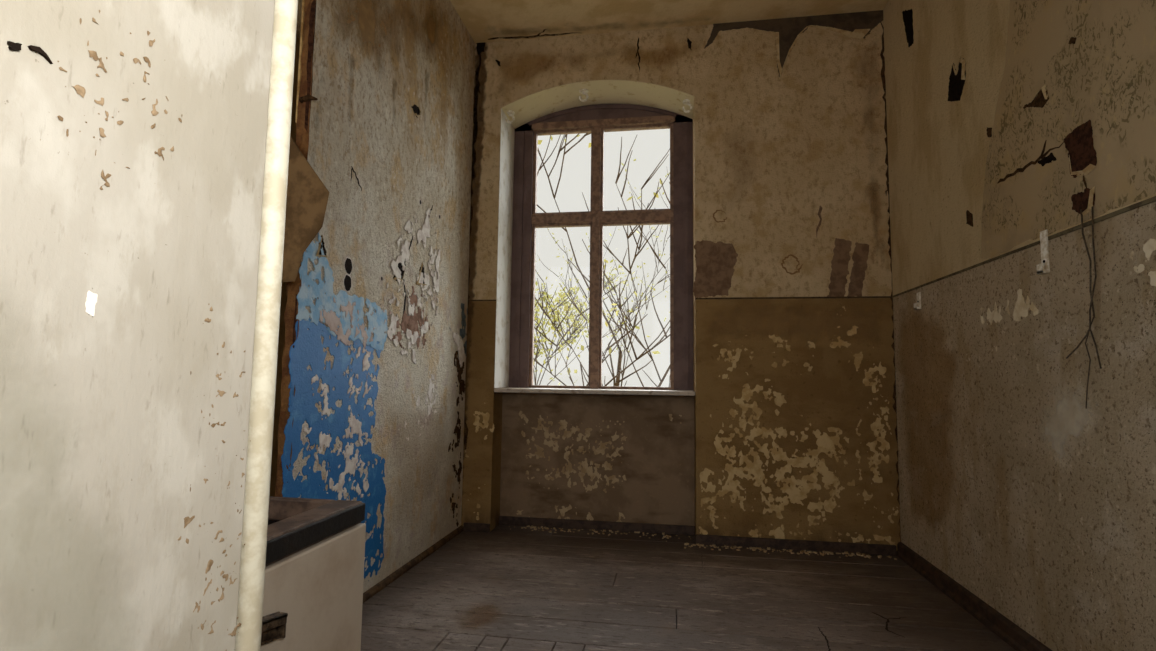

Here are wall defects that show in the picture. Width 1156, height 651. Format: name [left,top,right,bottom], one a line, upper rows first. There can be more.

peeling [275,208,440,581]
peeling [519,411,627,493]
peeling [693,238,899,545]
peeling [1130,239,1156,287]